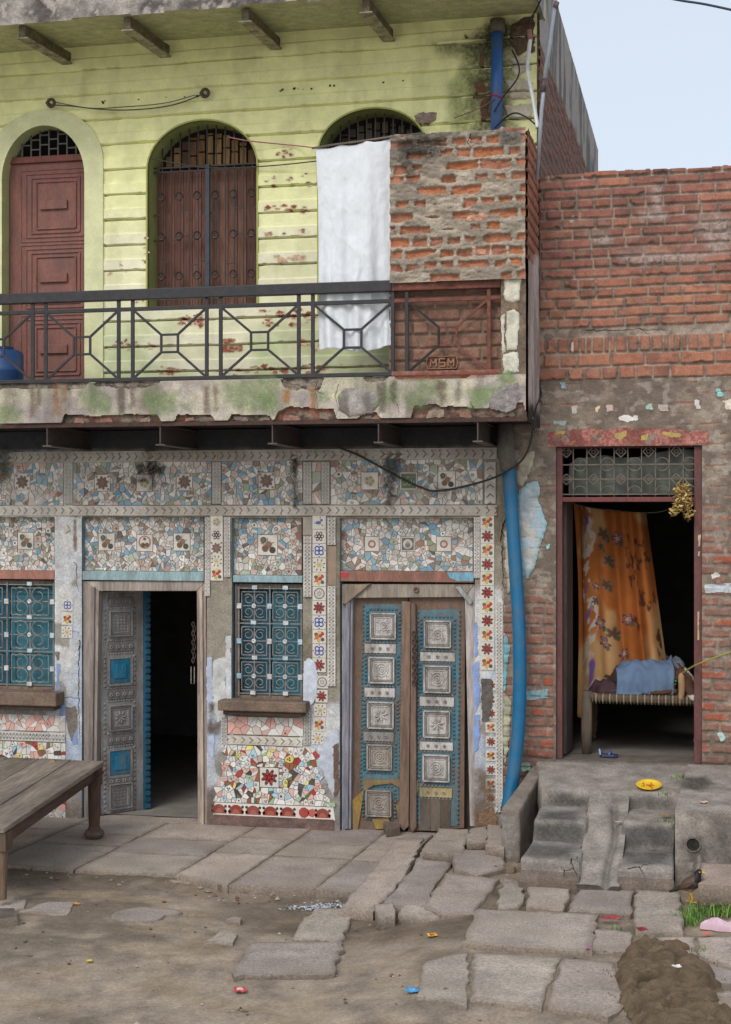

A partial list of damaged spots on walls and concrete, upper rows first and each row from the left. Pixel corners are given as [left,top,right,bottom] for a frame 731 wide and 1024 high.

peeling [264,203,308,214]
spalling [0,365,181,390]
spalling [233,338,343,392]
spalling [413,279,527,418]
spalling [64,414,161,423]
spalling [177,414,215,422]
spalling [231,406,337,421]
peeling [595,403,669,441]
flaking render [516,451,550,579]
peeling [206,636,231,758]
peeling [303,658,318,705]
peeling [318,729,339,797]